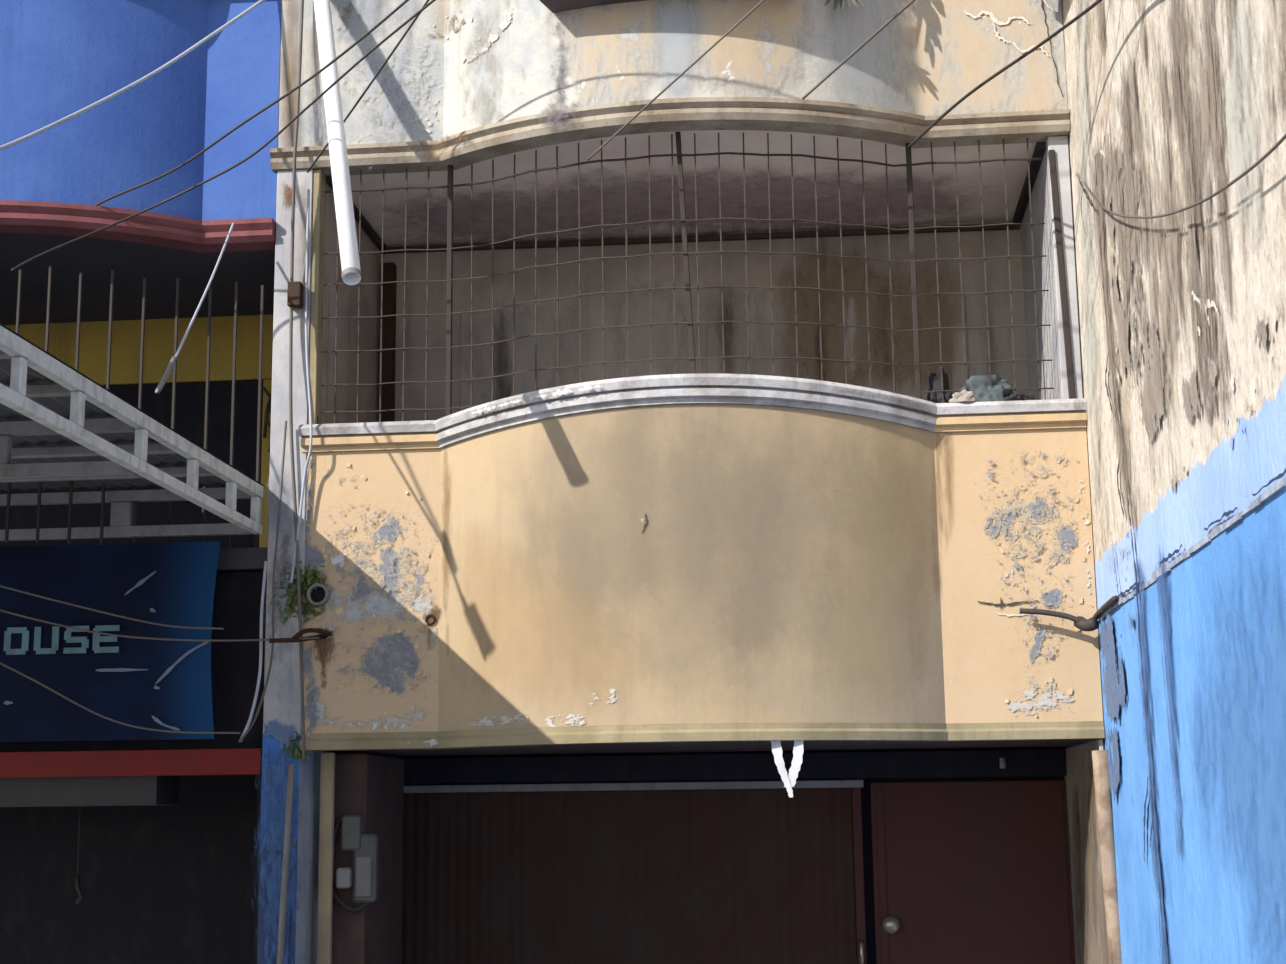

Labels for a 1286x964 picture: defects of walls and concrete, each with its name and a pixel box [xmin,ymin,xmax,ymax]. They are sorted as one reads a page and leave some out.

peeling [892,0,1068,116]
crack [963,0,1064,97]
water stain [1072,0,1286,531]
water stain [477,307,576,402]
water stain [618,285,689,377]
water stain [781,255,957,404]
flaking render [1181,350,1235,424]
rust [315,628,334,686]
peeling [263,456,442,748]
rust [423,608,440,644]
peeling [970,438,1092,717]
water stain [1134,550,1180,964]